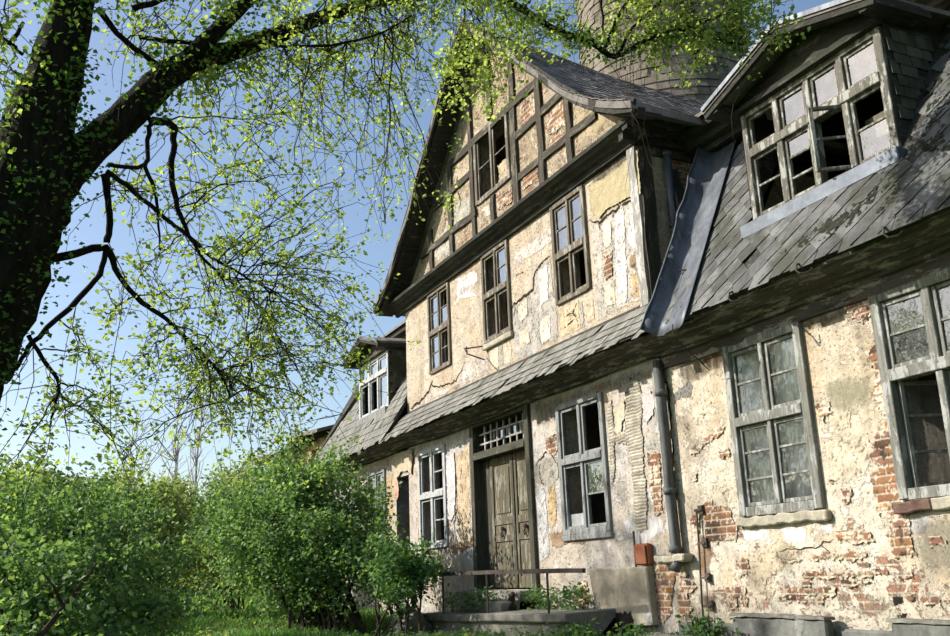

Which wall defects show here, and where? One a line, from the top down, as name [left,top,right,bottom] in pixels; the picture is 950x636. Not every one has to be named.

crack [590,200,631,230]
peeling [417,202,640,407]
crack [512,256,549,314]
crack [411,361,466,409]
peeling [640,380,692,424]
peeling [534,435,599,561]
flaking render [646,442,663,516]
flaking render [651,563,696,627]
flaking render [690,499,737,545]
flaking render [725,530,913,610]
flaking render [815,340,917,559]
leakage [904,514,950,564]